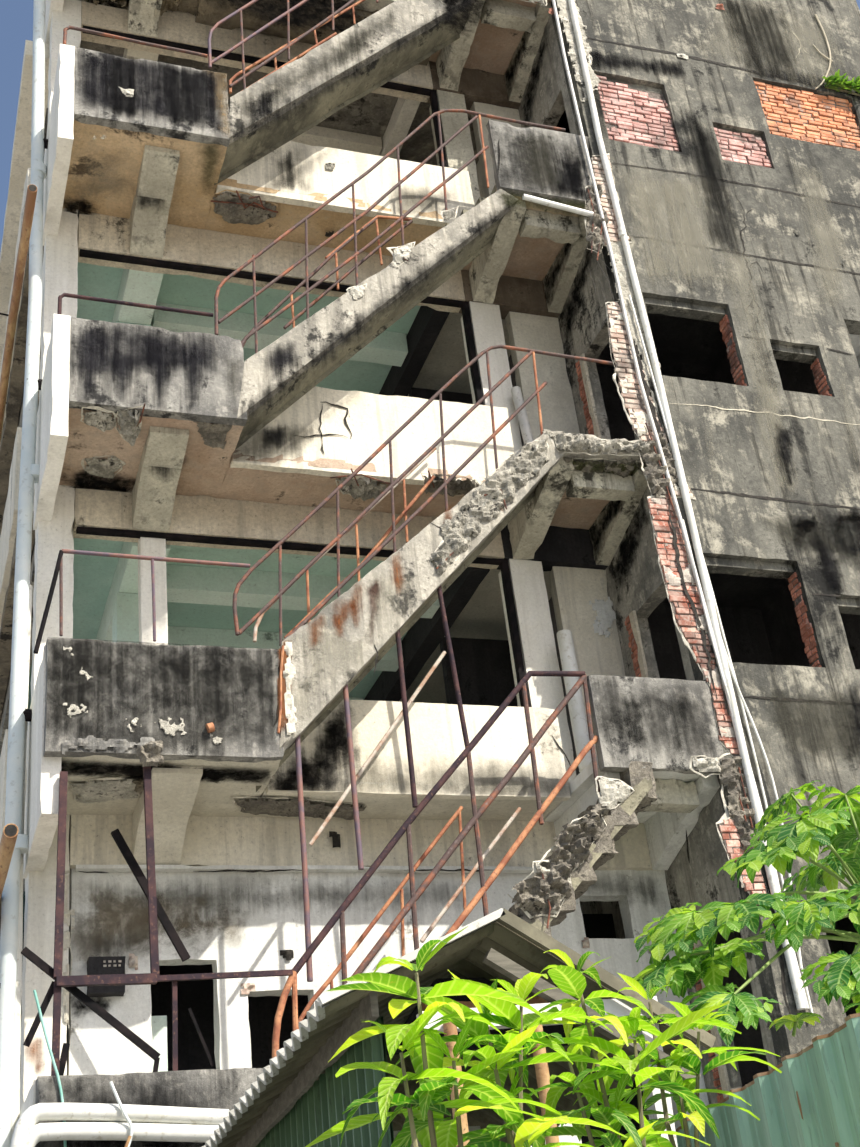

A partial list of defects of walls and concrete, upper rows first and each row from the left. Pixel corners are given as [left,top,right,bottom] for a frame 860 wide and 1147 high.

damp [80,52,226,124]
damp [589,51,683,76]
spalling [211,190,280,226]
damp [72,326,216,406]
crack [589,256,860,447]
spalling [421,153,769,905]
corrosion [334,583,379,633]
corrosion [393,558,402,587]
crack [667,478,860,706]
damp [48,639,275,751]
mould [275,712,359,791]
spalling [507,776,634,928]